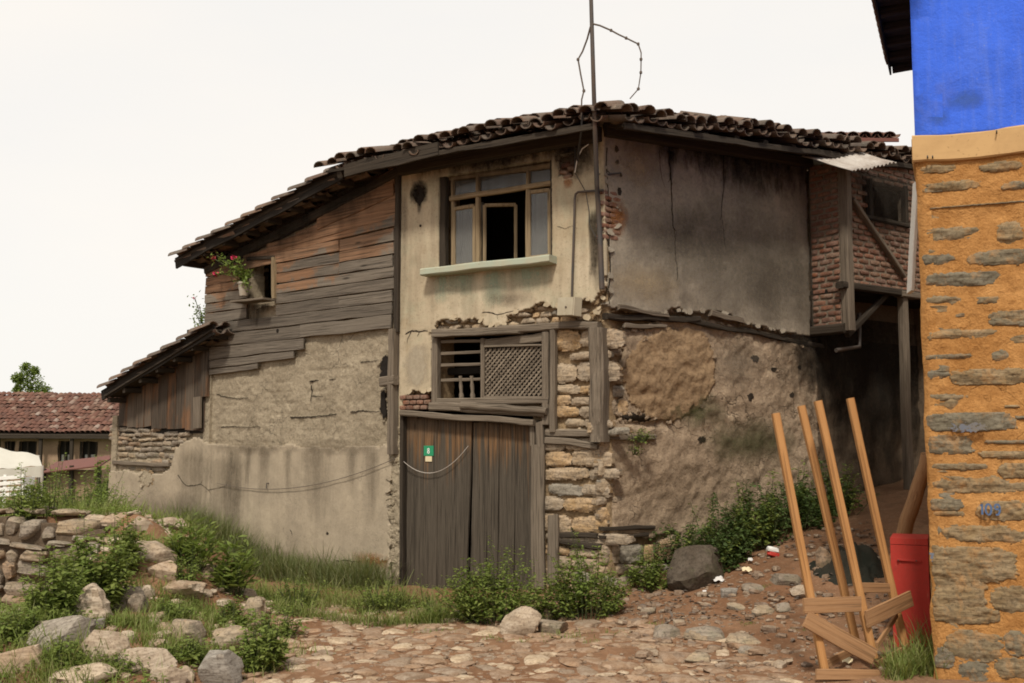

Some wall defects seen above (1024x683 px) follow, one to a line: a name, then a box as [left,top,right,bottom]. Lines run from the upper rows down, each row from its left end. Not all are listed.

flaking render [582,145,634,322]
crack [659,149,678,279]
flaking render [428,302,558,332]
flaking render [620,308,794,342]
flaking render [362,353,400,586]